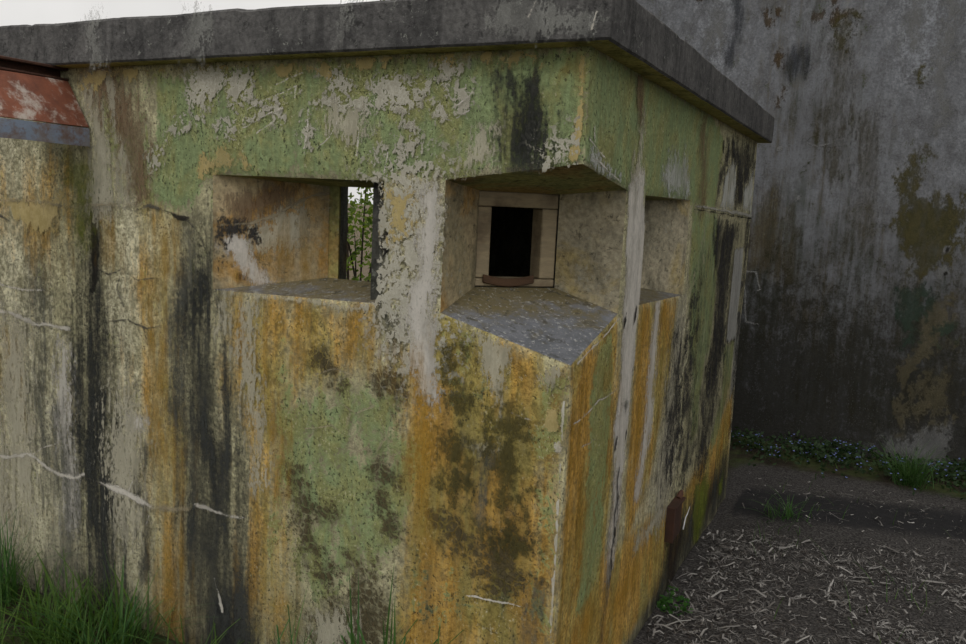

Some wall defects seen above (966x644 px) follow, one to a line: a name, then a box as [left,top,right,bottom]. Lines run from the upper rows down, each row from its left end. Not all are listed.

damp [491,67,557,172]
peeling [531,55,585,172]
damp [590,110,646,184]
peeling [77,50,542,428]
crack [0,309,70,331]
damp [0,162,156,619]
crack [0,445,243,523]
damp [165,181,316,644]
damp [431,331,541,561]
crack [608,467,622,592]
damp [633,133,756,617]